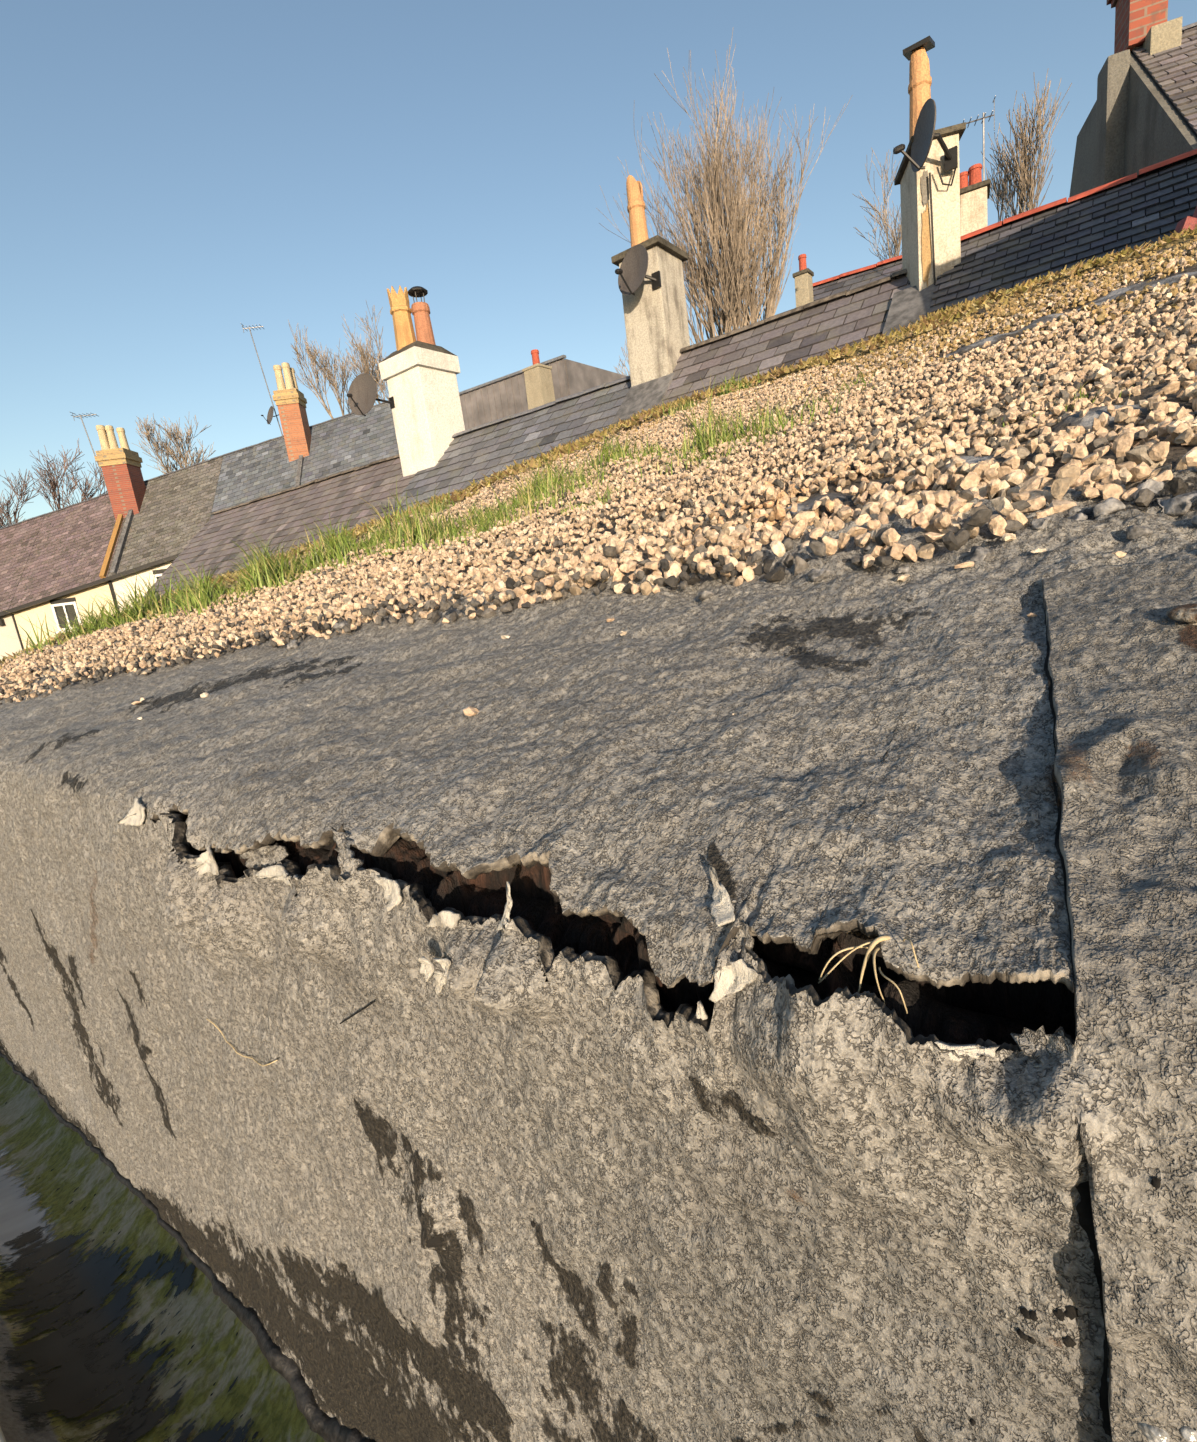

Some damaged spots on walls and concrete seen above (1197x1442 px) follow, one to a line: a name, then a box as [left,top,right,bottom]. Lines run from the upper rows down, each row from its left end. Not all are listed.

crack [707,841,737,915]
crack [1044,610,1074,992]
leakage [0,948,34,1031]
leakage [0,1039,103,1153]
leakage [31,909,123,1126]
leakage [117,971,177,1140]
crack [685,1074,778,1138]
leakage [0,1099,514,1442]
leakage [533,1219,658,1442]
crack [1076,1181,1112,1440]